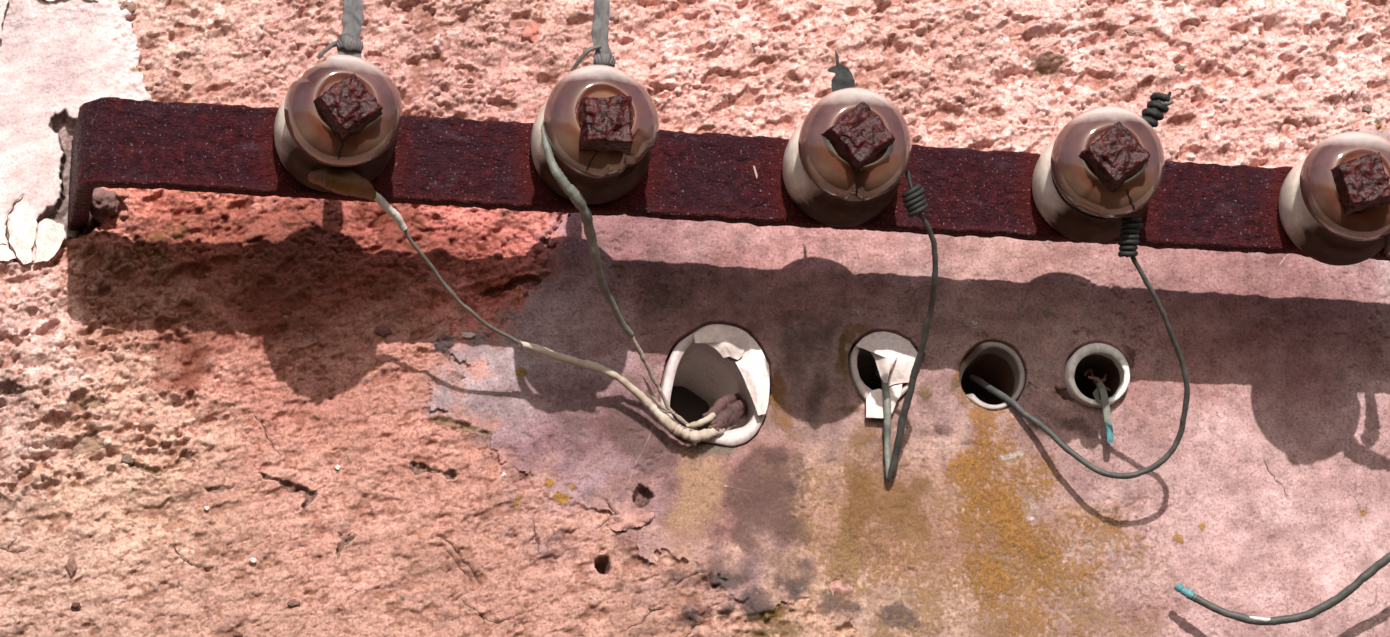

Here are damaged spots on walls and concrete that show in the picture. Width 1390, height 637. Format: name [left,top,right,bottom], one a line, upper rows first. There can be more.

spalling [1030,50,1069,78]
flaking render [0,110,99,264]
spalling [479,274,542,298]
flaking render [1122,344,1136,369]
spalling [1055,387,1074,401]
flaking render [428,415,491,437]
spalling [410,462,457,479]
leakage [667,442,799,542]
flaking render [596,484,654,563]
leakage [711,564,807,616]
leakage [822,591,861,613]
leakage [882,605,918,630]